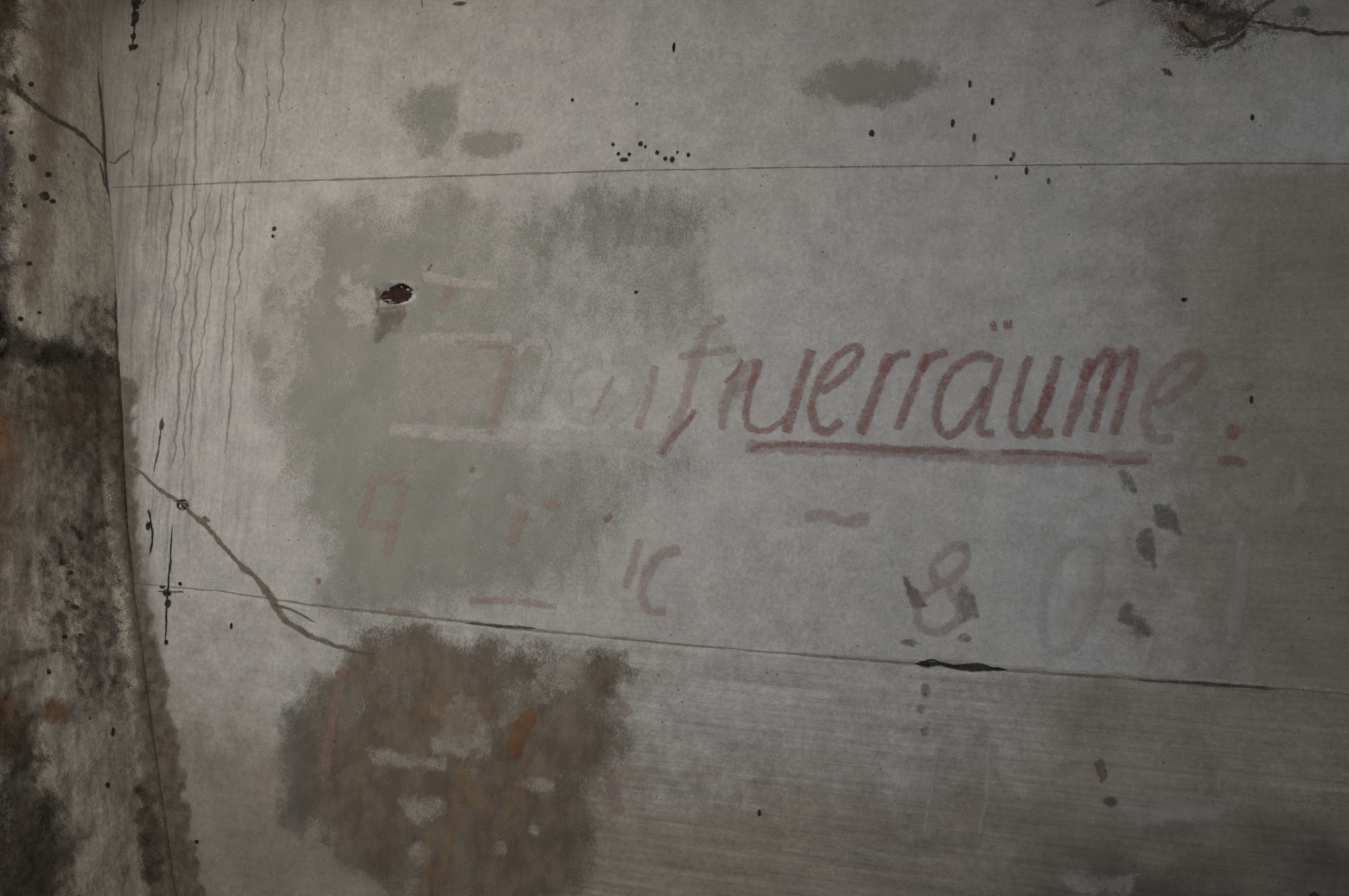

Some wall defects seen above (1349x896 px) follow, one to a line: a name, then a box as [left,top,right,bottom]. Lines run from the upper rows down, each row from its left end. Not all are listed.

crack [1094,0,1349,58]
crack [0,70,130,360]
crack [125,464,375,655]
damp [280,623,635,896]